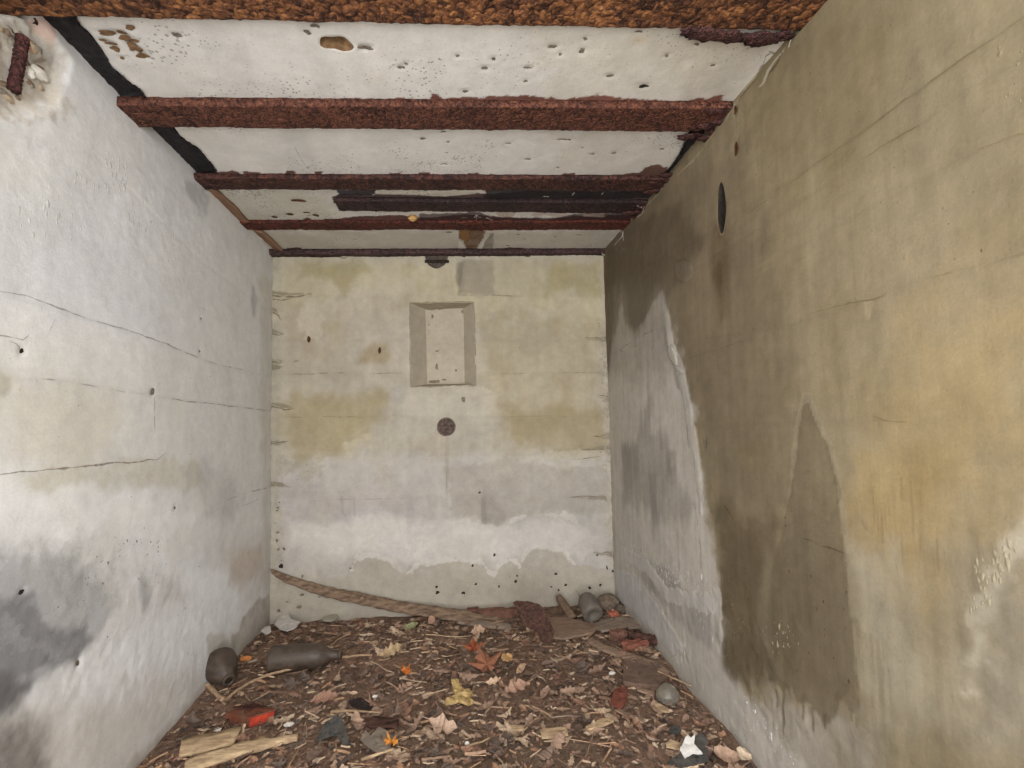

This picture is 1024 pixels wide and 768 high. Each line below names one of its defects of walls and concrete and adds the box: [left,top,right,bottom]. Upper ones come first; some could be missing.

spalling [0,14,82,142]
corrosion [263,91,671,101]
corrosion [609,163,671,175]
leakage [5,437,248,541]
crack [0,277,395,578]
leakage [120,185,894,768]
leakage [0,527,108,768]
leakage [949,483,1024,768]